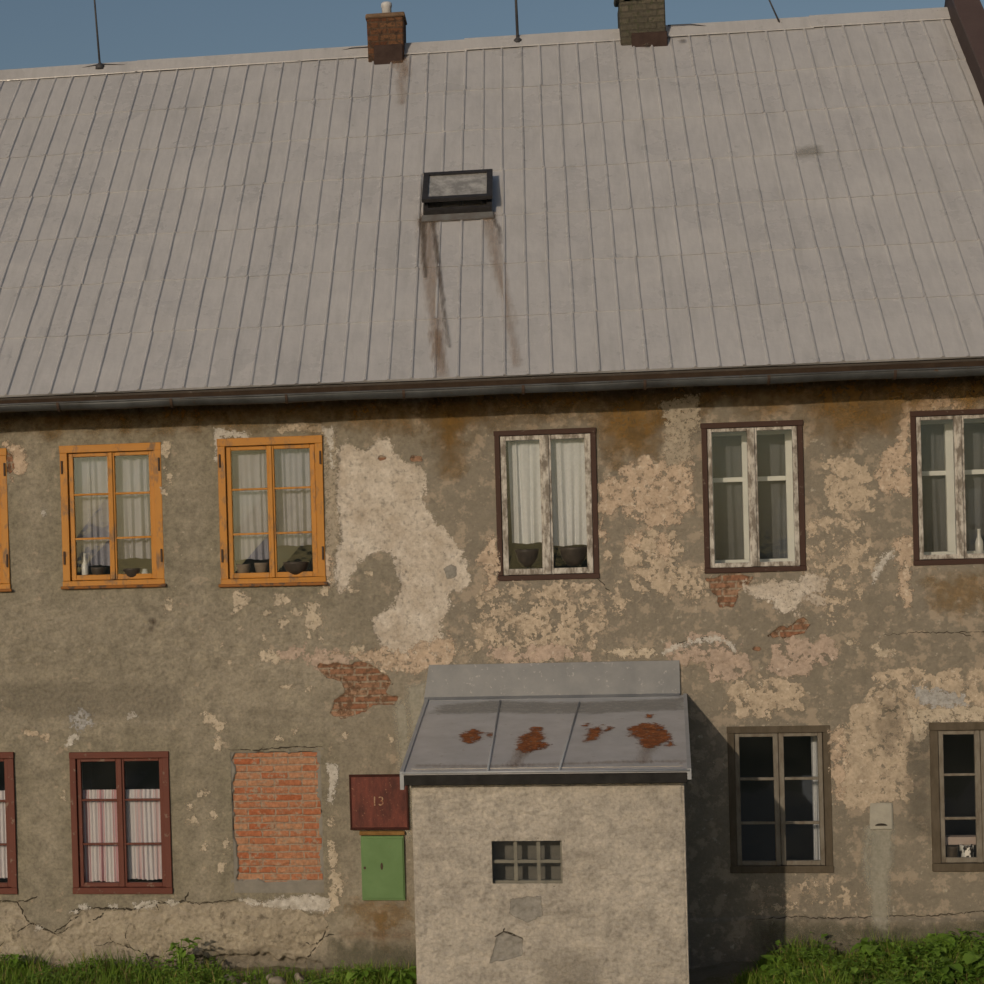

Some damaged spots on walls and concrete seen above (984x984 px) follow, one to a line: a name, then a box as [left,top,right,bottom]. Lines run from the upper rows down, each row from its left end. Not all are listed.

corrosion [419,217,442,288]
flaking render [257,393,968,742]
flaking render [200,710,227,751]
corrosion [459,729,493,743]
corrosion [516,727,549,753]
corrosion [581,723,612,741]
flaking render [827,641,984,818]
flaking render [184,788,218,826]
flaking render [325,763,340,827]
crack [0,892,236,962]
flaking render [0,838,345,969]
flaking render [490,932,523,963]